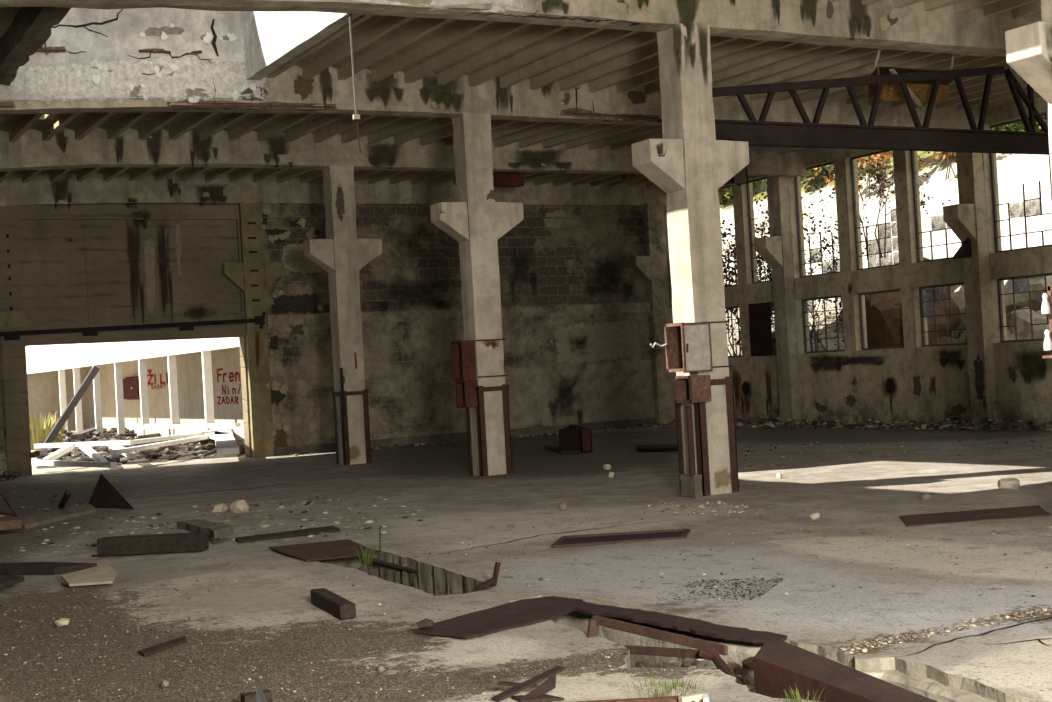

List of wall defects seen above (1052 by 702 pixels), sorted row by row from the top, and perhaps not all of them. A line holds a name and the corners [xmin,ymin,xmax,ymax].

spalling [36,42,67,55]
crack [52,9,123,54]
peeling [138,23,184,79]
crack [128,19,219,99]
peeling [190,32,237,55]
leakage [674,25,707,79]
leakage [800,0,817,26]
leakage [849,0,871,40]
leakage [126,198,207,323]
flaking render [265,290,323,356]
leakage [1017,352,1050,384]
crack [909,617,1052,655]